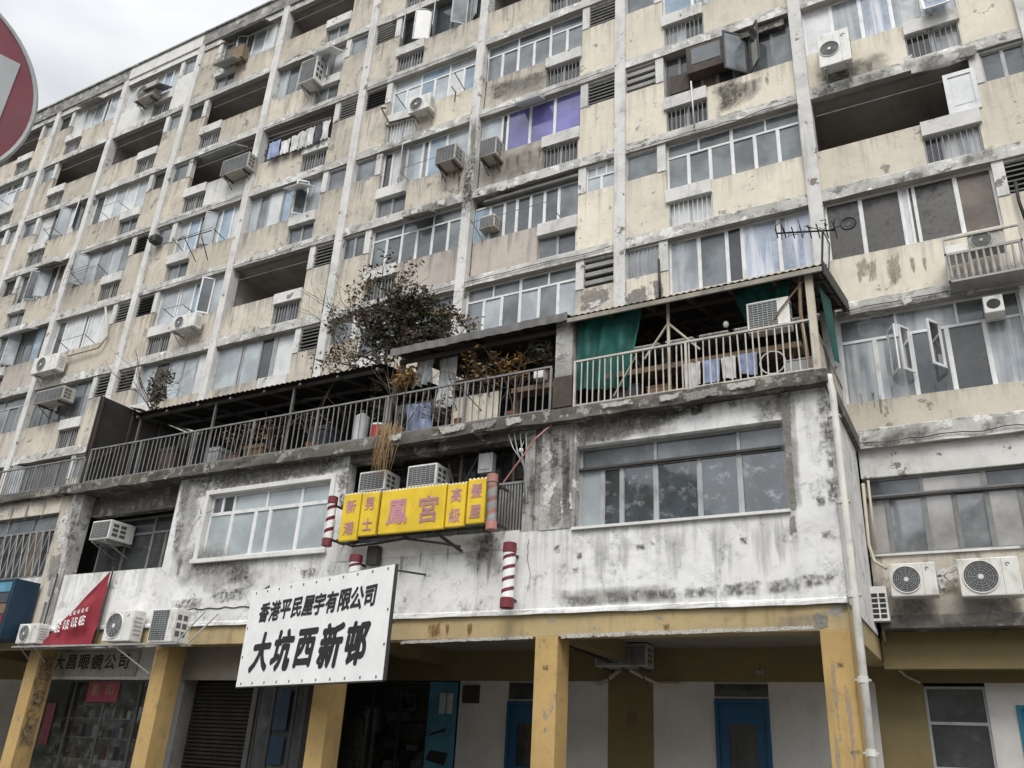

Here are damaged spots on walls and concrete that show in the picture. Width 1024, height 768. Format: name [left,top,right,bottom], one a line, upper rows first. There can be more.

leakage [719,79,767,107]
leakage [820,389,836,466]
leakage [174,458,350,602]
leakage [569,588,711,604]
leakage [727,581,758,595]
leakage [770,575,830,591]